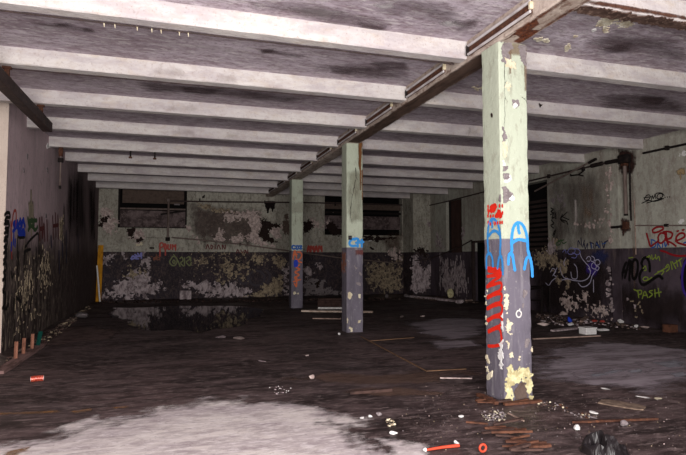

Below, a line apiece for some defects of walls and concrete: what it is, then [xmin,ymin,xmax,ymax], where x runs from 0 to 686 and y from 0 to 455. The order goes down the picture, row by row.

damp [334,63,401,75]
peeling [501,41,527,69]
rust [506,0,574,73]
spalling [574,6,686,33]
rust [349,55,482,200]
spalling [498,126,515,203]
damp [64,183,94,232]
peeling [182,209,469,299]
peeling [534,237,623,321]
peeling [485,286,534,401]